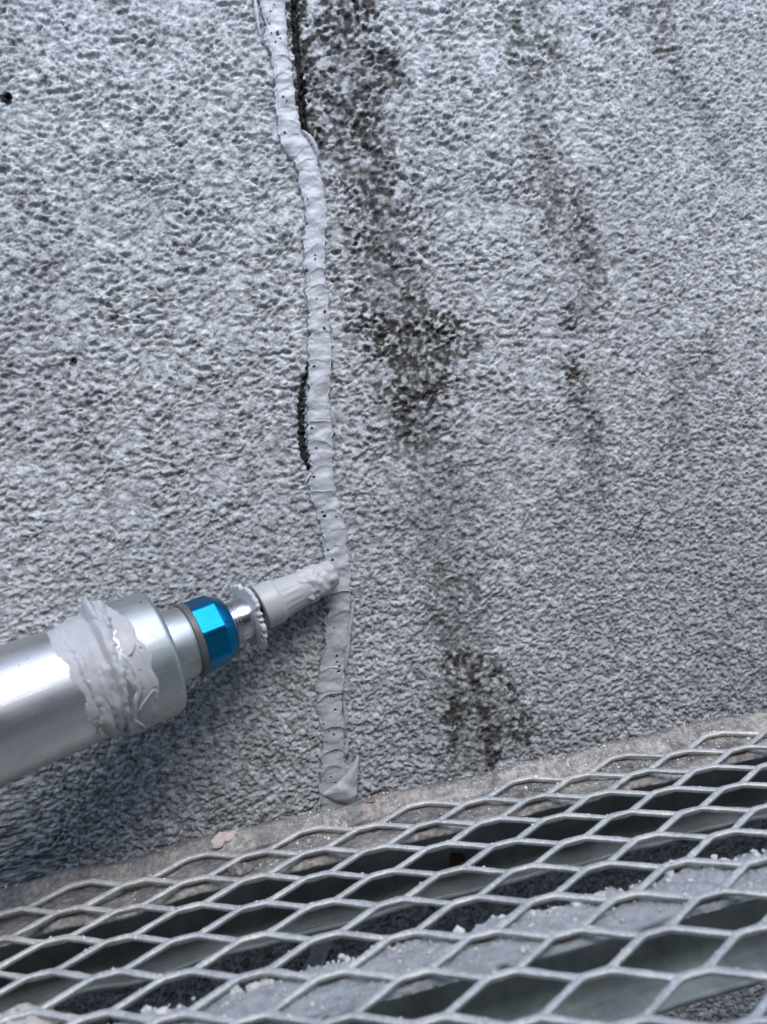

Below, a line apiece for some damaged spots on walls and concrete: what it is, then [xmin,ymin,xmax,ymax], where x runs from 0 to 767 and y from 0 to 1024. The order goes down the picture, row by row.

crack [291,0,307,134]
water stain [285,0,410,218]
water stain [355,238,398,270]
crack [297,380,309,468]
water stain [345,278,483,446]
water stain [442,651,532,768]